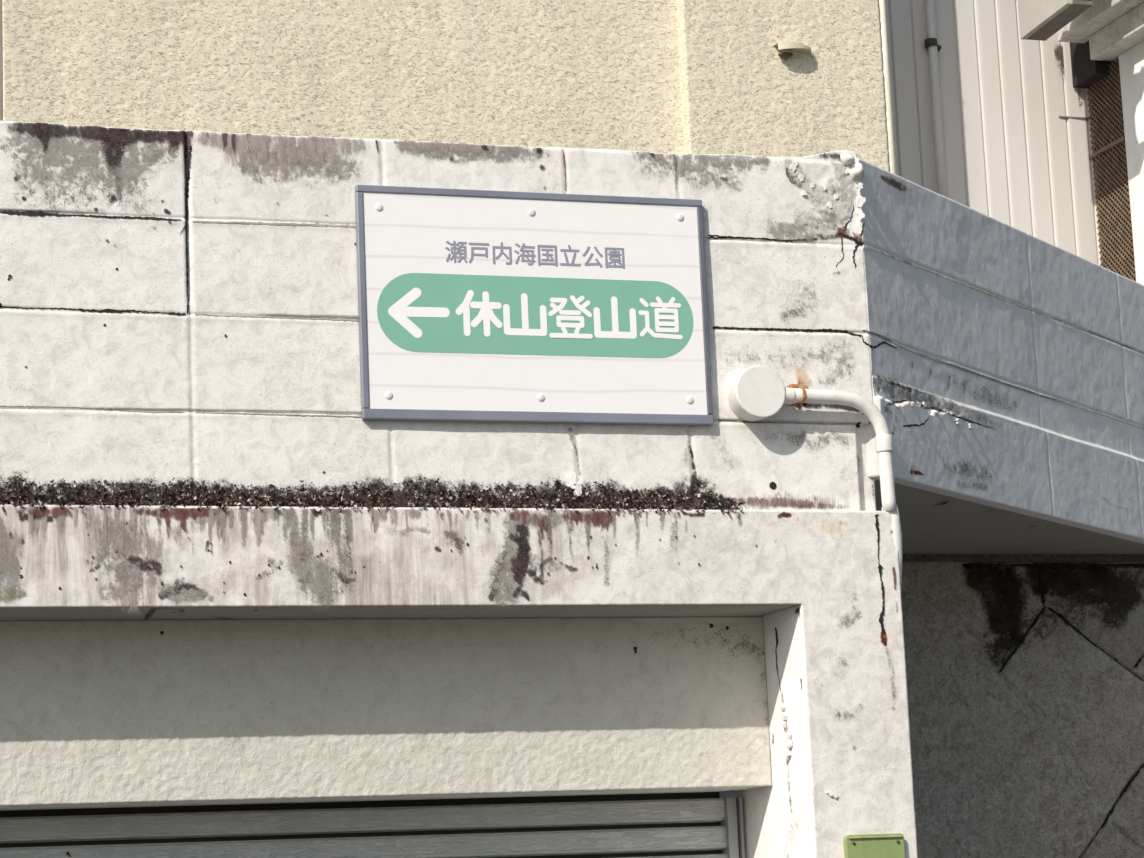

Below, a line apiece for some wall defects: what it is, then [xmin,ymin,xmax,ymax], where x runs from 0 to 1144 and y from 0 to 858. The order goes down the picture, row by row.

water stain [1,122,379,224]
water stain [394,140,550,169]
spalling [767,153,866,243]
crack [707,205,1144,354]
corrosion [797,368,809,389]
crack [713,326,1144,430]
water stain [731,493,841,509]
water stain [0,506,365,620]
water stain [369,509,705,606]
crack [875,514,895,697]
crack [999,572,1144,681]
crack [1080,764,1144,857]